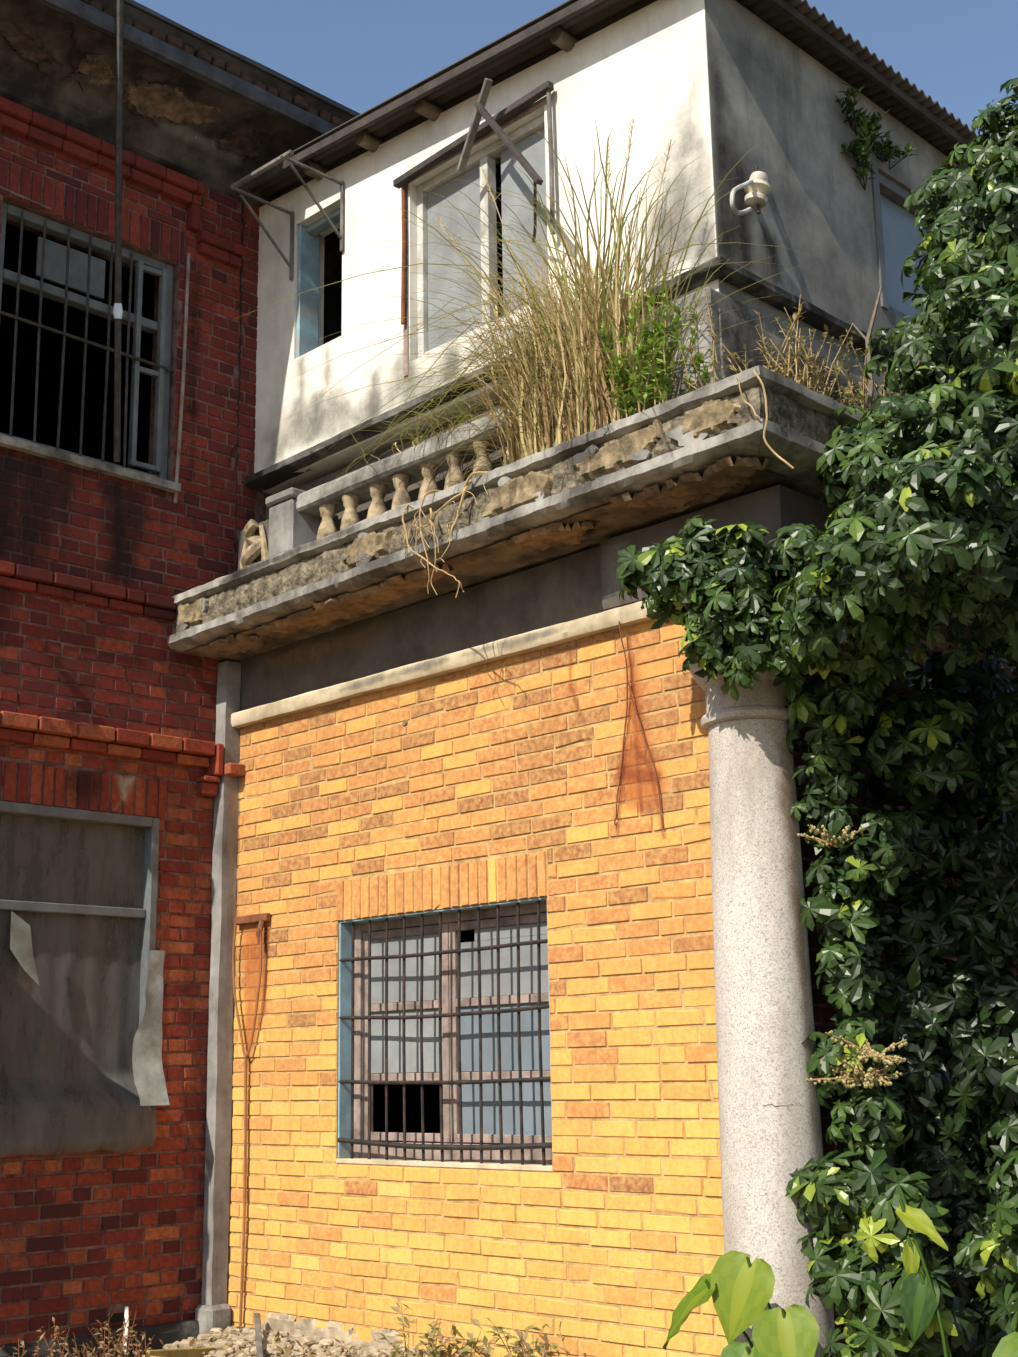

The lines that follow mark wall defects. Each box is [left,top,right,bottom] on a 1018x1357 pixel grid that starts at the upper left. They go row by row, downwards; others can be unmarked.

spalling [70,55,221,125]
water stain [765,232,779,282]
spalling [479,470,554,521]
spalling [340,530,395,570]
spalling [507,520,601,551]
spalling [176,596,209,632]
spalling [203,563,453,656]